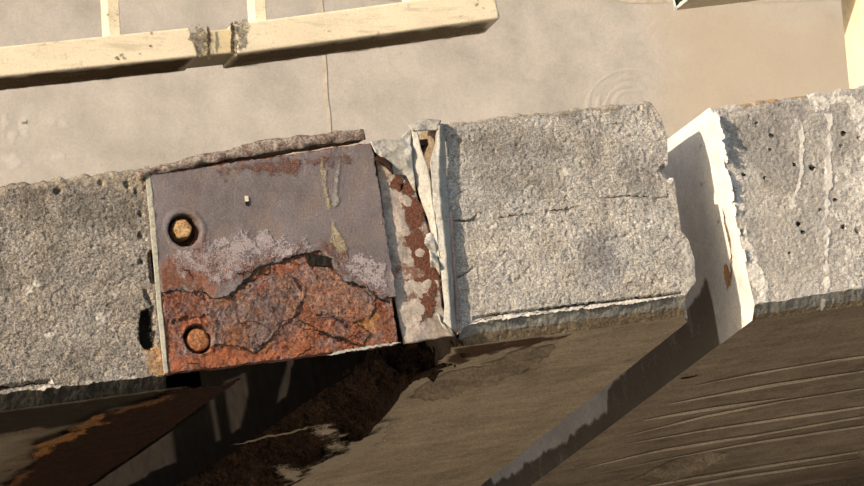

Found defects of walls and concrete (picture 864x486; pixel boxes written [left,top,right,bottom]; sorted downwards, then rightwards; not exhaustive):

damp [444,0,858,311]
crack [165,251,315,300]
rust [145,238,396,376]
spalling [93,144,470,486]
crack [189,266,396,365]
rust [389,174,442,325]
damp [460,219,674,330]
damp [481,275,721,486]